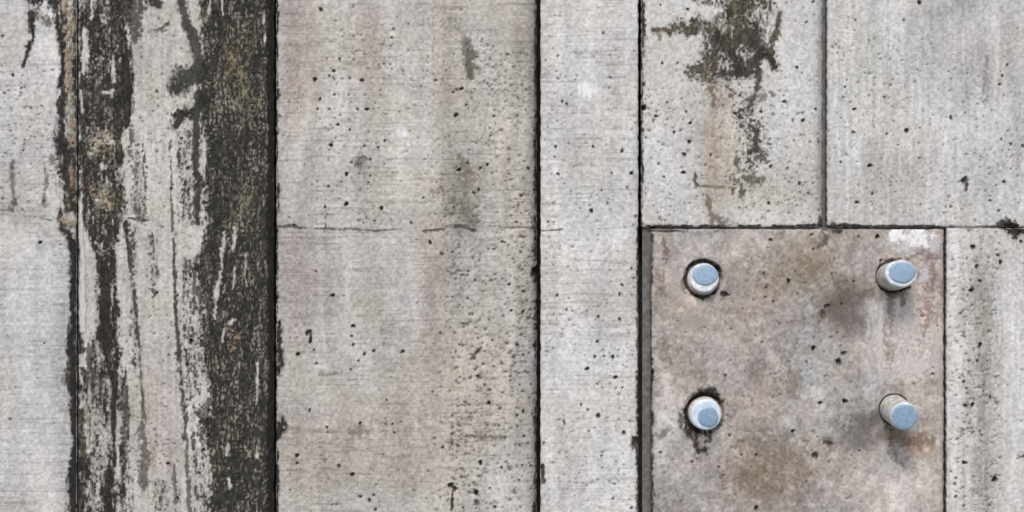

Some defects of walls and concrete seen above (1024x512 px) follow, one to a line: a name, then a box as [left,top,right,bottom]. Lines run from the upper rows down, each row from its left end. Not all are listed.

water stain [21,0,287,512]